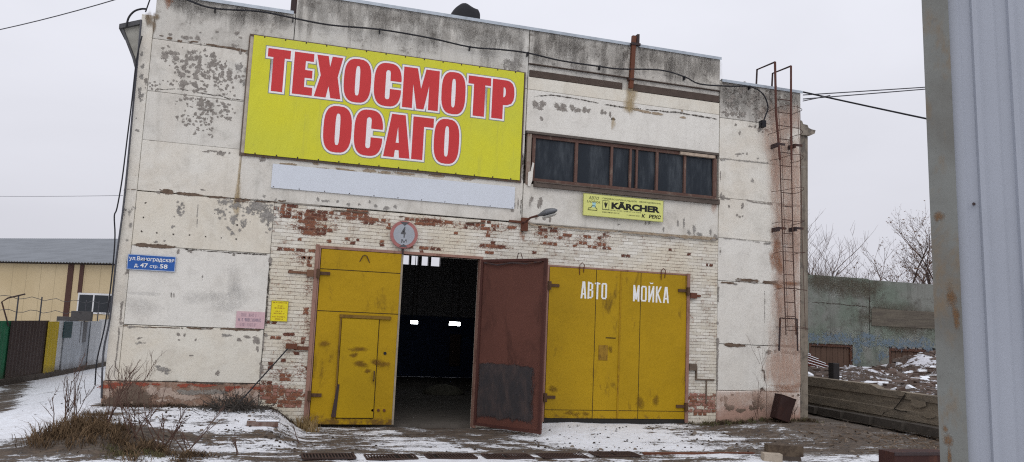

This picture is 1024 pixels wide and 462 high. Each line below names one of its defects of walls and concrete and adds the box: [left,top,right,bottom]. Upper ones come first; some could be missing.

peeling [138,31,248,156]
flaking render [97,195,396,408]
flaking render [688,393,765,416]
rust [720,114,800,406]